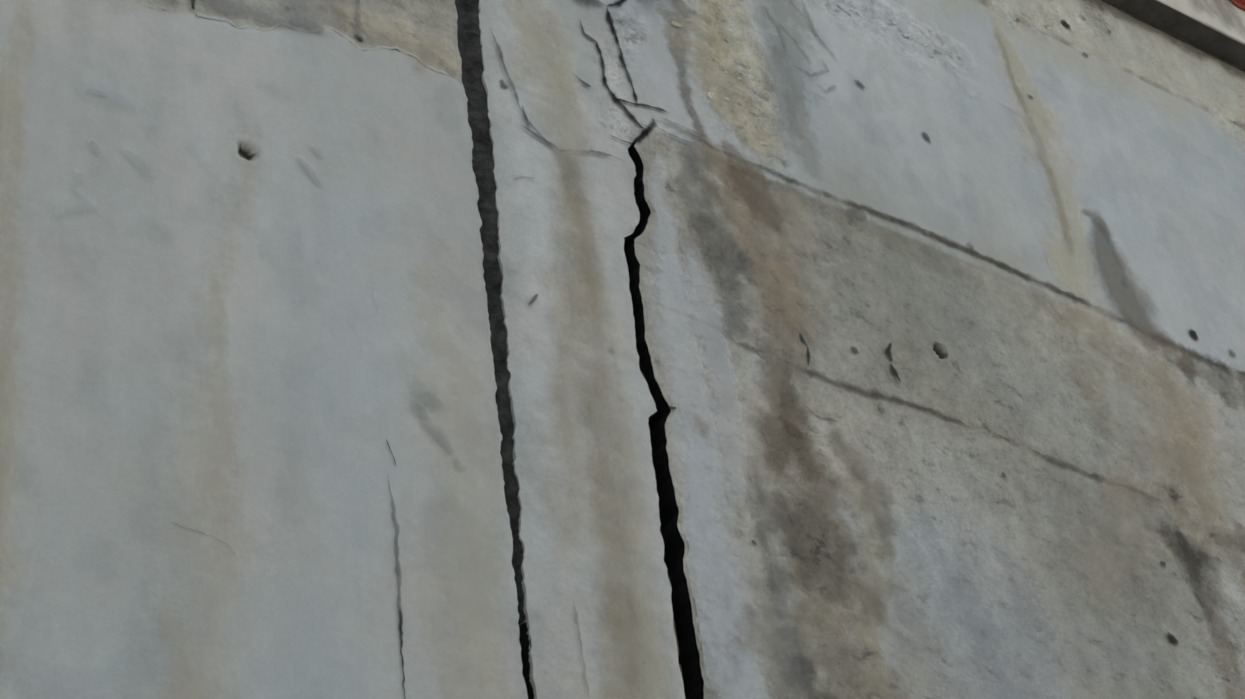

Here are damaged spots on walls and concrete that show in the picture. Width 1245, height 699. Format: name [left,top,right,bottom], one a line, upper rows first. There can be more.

peeling [671,0,774,161]
crack [489,0,718,699]
crack [397,607,405,699]